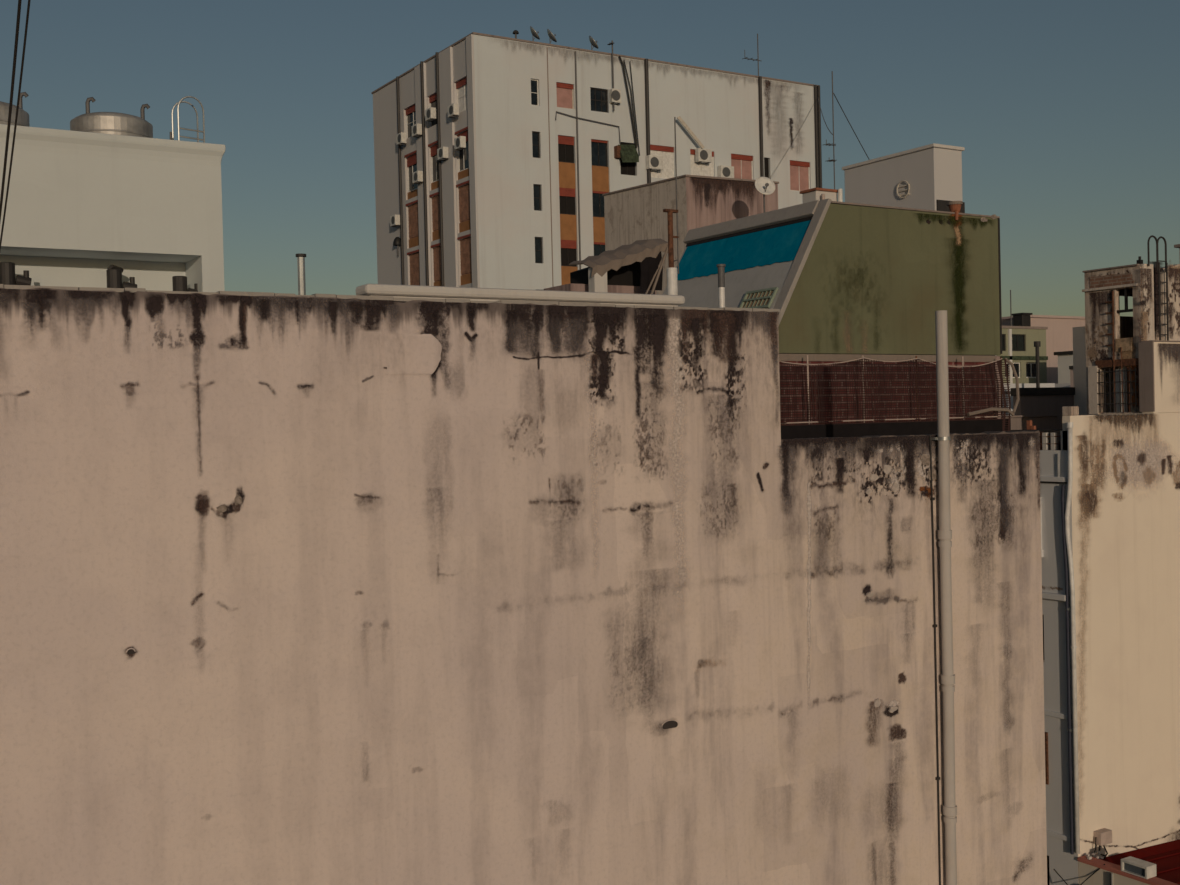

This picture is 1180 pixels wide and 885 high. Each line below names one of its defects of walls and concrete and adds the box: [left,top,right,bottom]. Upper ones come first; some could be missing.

leakage [0,289,398,430]
leakage [418,301,488,381]
leakage [953,224,965,347]
leakage [1086,290,1113,348]
leakage [1138,261,1180,377]
leakage [506,304,778,586]
leakage [954,433,1040,540]
leakage [1077,436,1088,512]
peeling [1081,440,1180,515]
leakage [779,435,937,697]